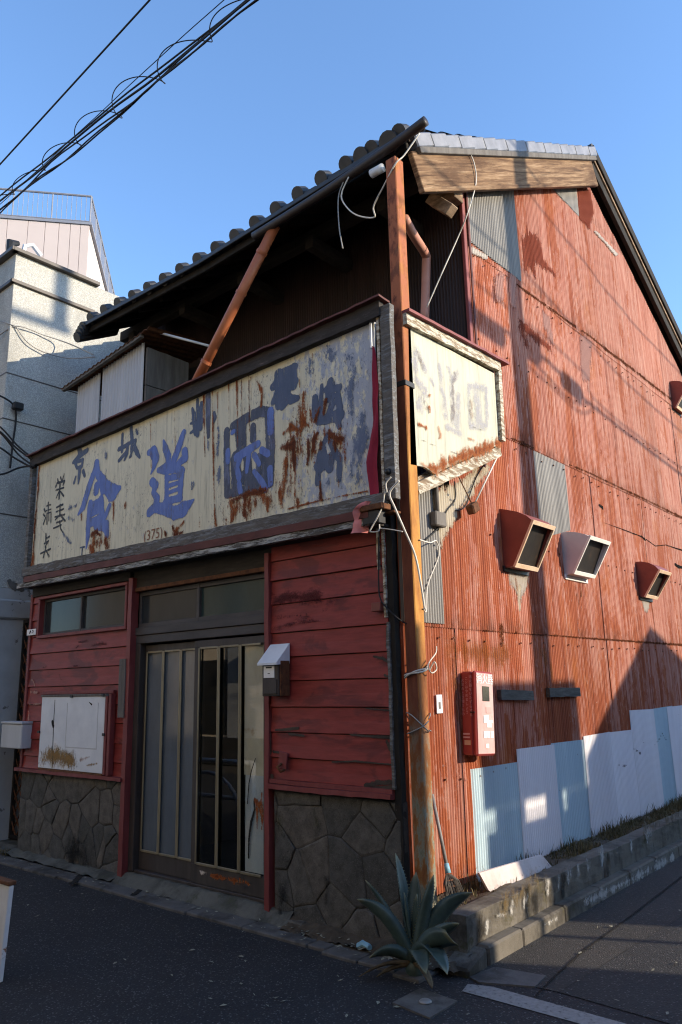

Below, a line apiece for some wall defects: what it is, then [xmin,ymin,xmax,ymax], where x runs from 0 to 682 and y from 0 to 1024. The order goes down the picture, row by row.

peeling [305,344,369,491]
rust [203,376,367,527]
rust [421,437,534,476]
rust [569,464,682,518]
rust [89,501,126,554]
rust [41,748,97,768]